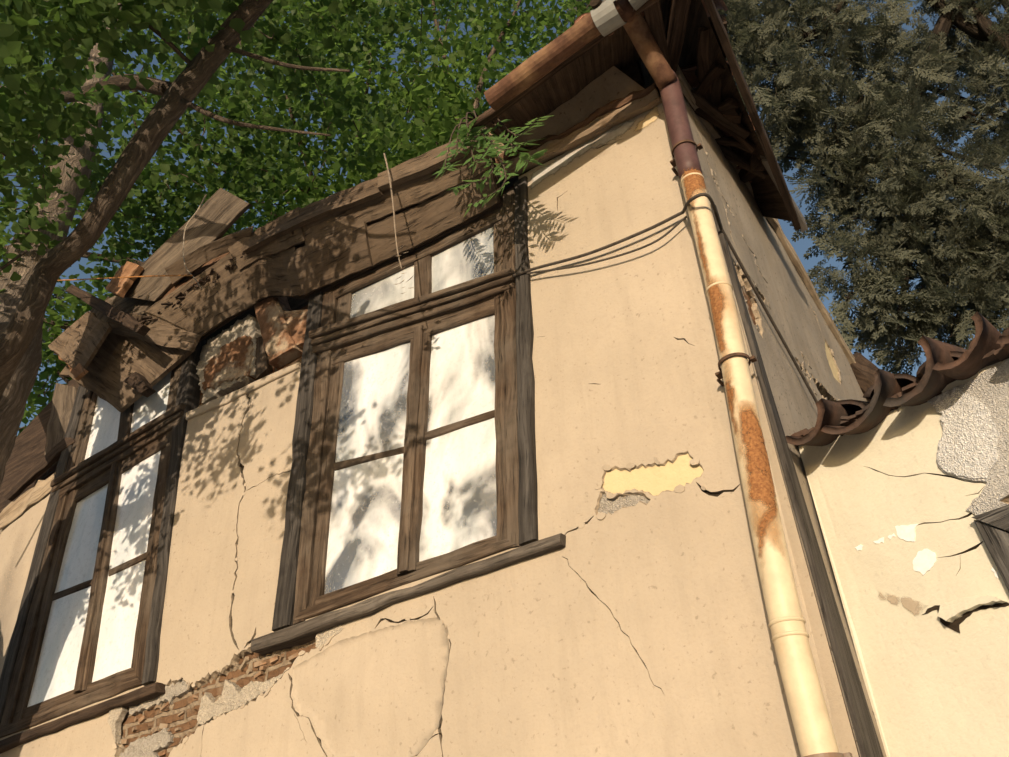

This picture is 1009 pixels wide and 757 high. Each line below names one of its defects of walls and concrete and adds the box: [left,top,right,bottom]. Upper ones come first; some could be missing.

rust [696,223,725,351]
spalling [795,351,840,402]
crack [229,372,291,650]
peeling [594,451,704,520]
rust [725,382,778,556]
crack [864,466,986,525]
peeling [928,387,1000,479]
crack [938,541,984,574]
crack [375,596,451,651]
crack [562,517,664,694]
spalling [107,625,344,757]
crack [288,673,327,757]